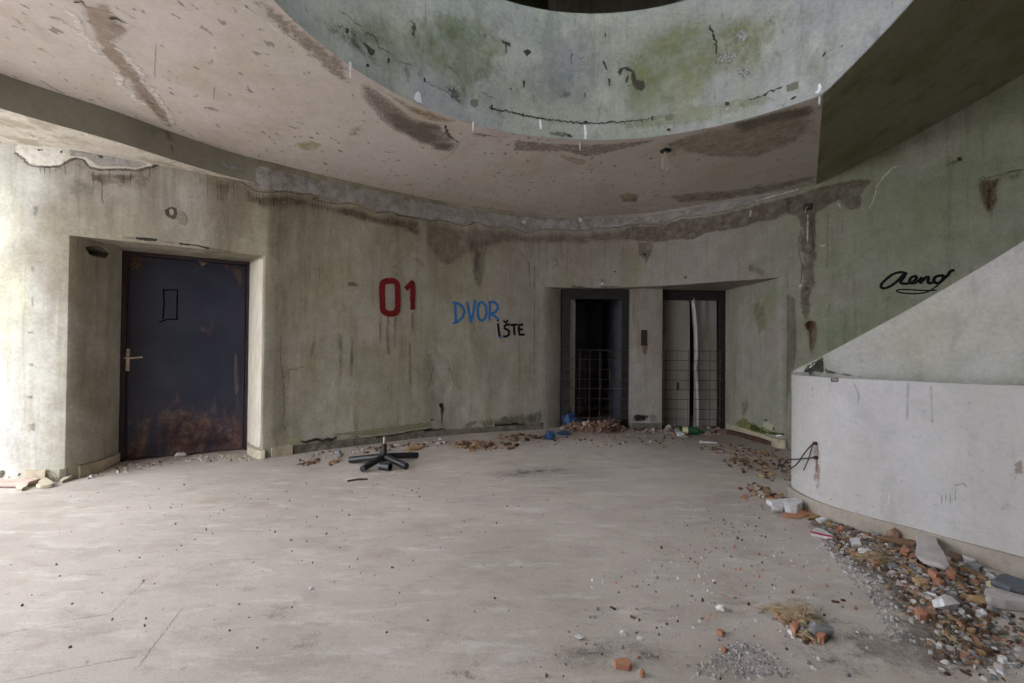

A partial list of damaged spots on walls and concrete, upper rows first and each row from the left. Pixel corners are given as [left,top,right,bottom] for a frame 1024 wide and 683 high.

leakage [56,6,176,124]
flaking render [15,144,155,170]
leakage [362,84,454,151]
flaking render [220,162,799,232]
leakage [671,106,814,157]
corrosion [980,169,1023,211]
leakage [242,165,899,316]